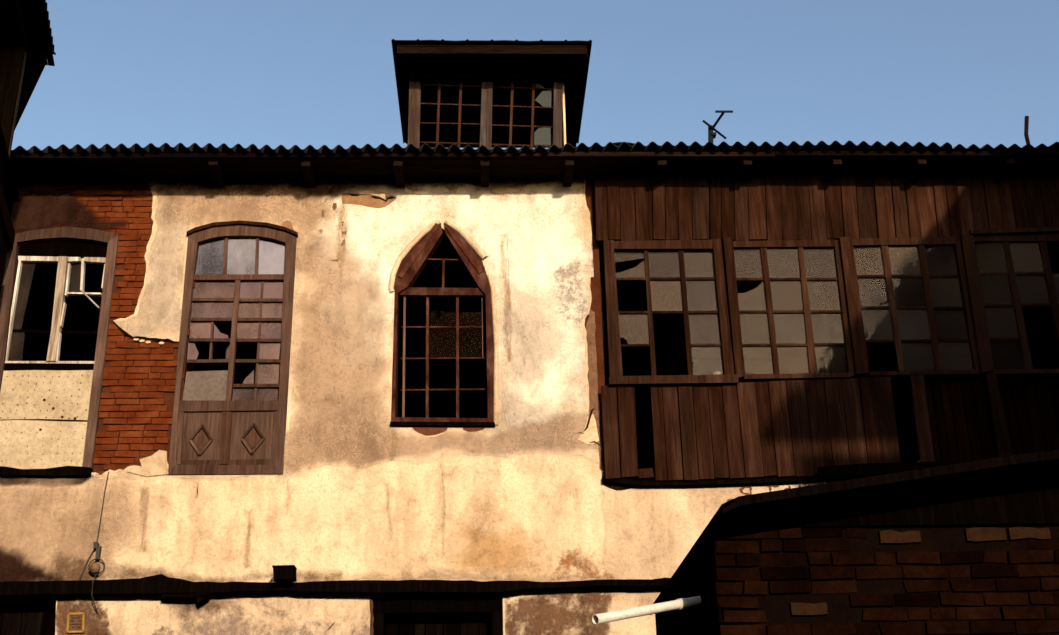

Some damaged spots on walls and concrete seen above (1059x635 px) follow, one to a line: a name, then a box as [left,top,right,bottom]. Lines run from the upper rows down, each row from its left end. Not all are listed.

leakage [149,178,551,326]
flaking render [319,190,397,234]
flaking render [43,187,190,479]
leakage [284,210,596,467]
leakage [0,486,133,580]